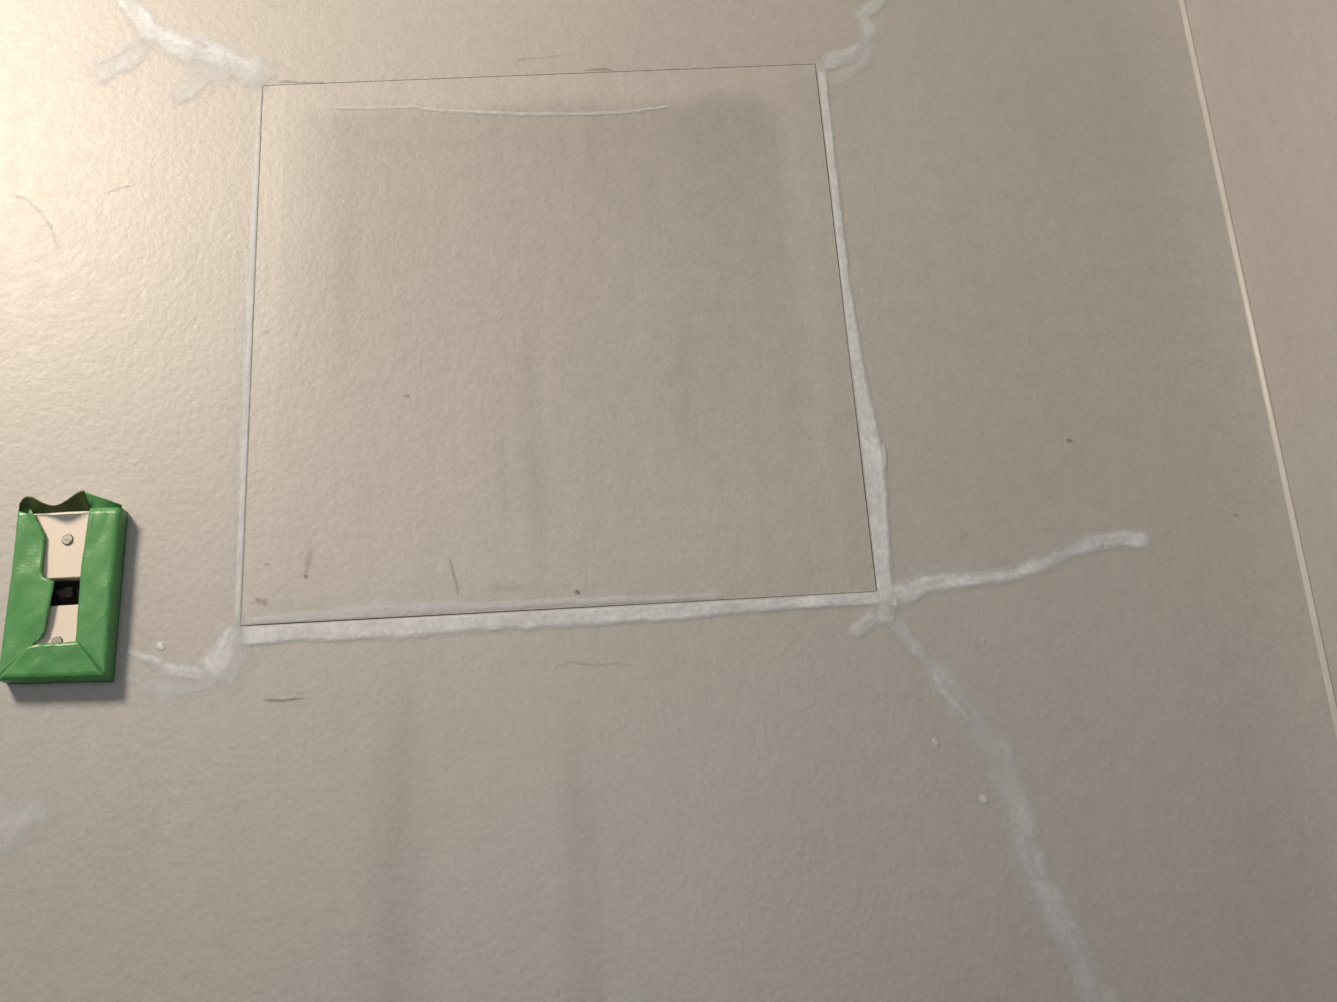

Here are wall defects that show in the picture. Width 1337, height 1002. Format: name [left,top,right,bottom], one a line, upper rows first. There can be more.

crack [97,0,271,100]
crack [825,1,882,68]
crack [128,626,240,691]
crack [851,531,1149,718]
crack [1007,782,1114,1002]